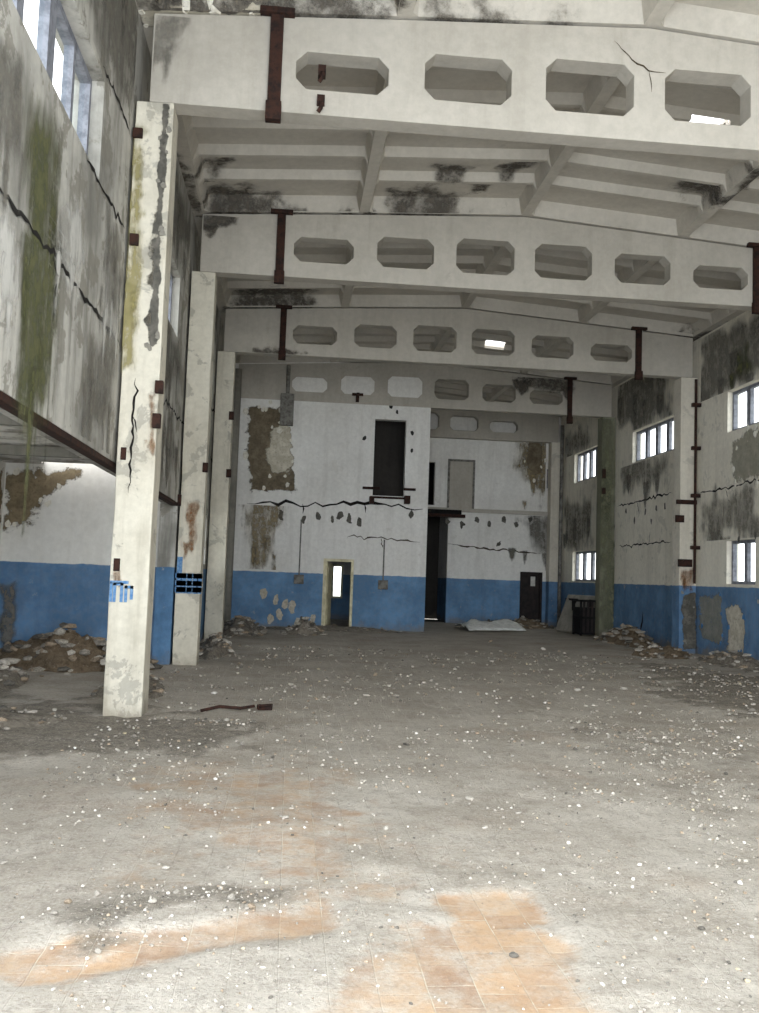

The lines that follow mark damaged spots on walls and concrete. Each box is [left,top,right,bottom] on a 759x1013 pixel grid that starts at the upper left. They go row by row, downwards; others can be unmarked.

damp [91,0,384,92]
crack [617,43,664,92]
crack [85,150,124,226]
damp [388,164,466,216]
damp [0,45,85,533]
crack [0,188,120,345]
damp [679,315,759,402]
flaking render [243,400,296,492]
flaking render [0,467,82,531]
flaking render [301,511,362,527]
crack [247,499,421,547]
peeling [681,591,746,654]